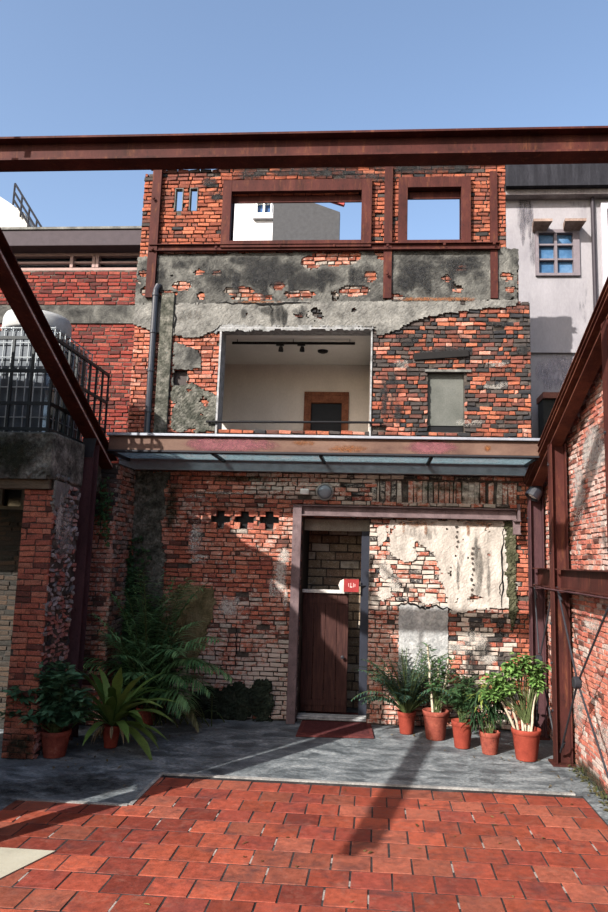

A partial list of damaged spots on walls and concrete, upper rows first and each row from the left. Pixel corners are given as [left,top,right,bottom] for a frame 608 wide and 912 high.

spalling [301,251,361,270]
spalling [159,268,221,296]
spalling [223,282,316,301]
water stain [260,280,287,325]
spalling [331,271,377,297]
peeling [213,324,374,335]
peeling [169,342,217,434]
peeling [377,518,509,614]